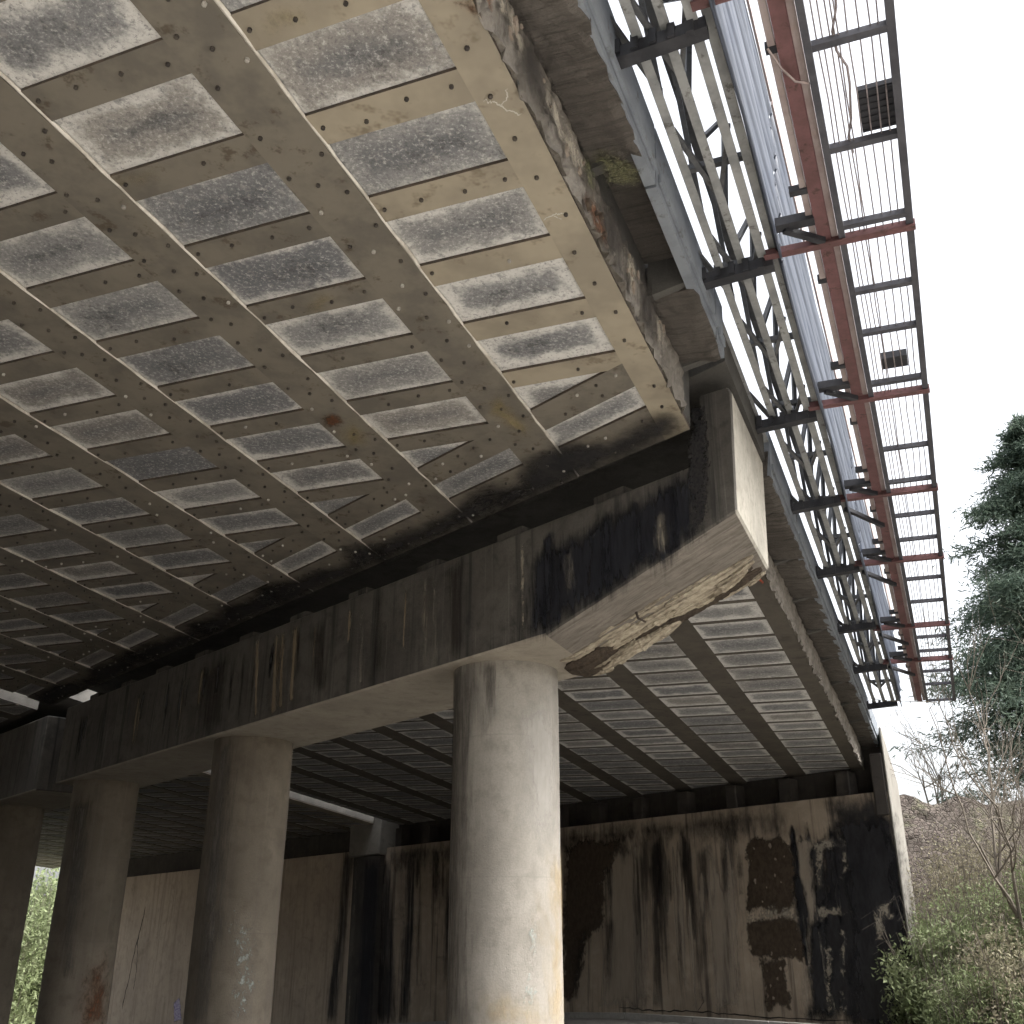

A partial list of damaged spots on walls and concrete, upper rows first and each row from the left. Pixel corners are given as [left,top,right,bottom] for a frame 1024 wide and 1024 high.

crack [484,89,522,116]
damp [35,416,675,704]
damp [521,405,710,635]
spalling [560,554,766,677]
damp [563,800,914,1024]